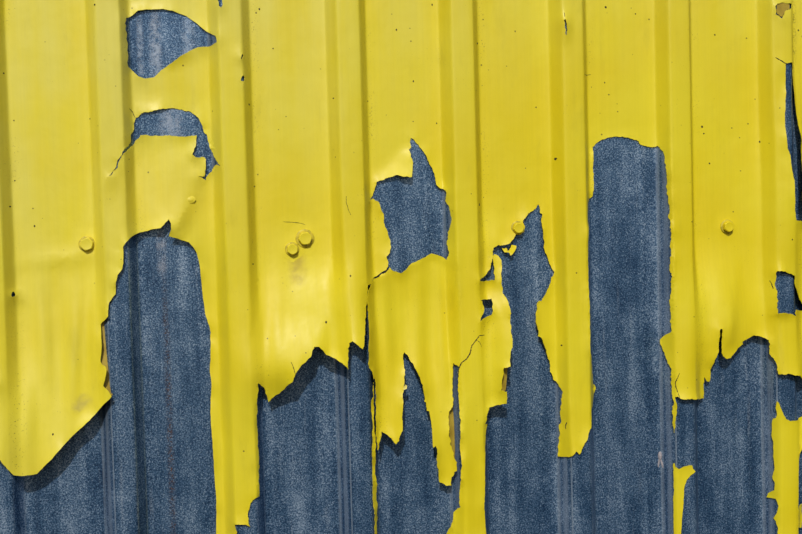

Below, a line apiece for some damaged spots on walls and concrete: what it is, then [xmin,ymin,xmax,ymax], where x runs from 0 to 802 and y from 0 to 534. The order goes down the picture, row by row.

peeling [125,9,216,78]
peeling [785,62,802,179]
peeling [0,108,220,534]
peeling [235,139,462,534]
crack [458,335,484,377]
peeling [480,137,802,534]